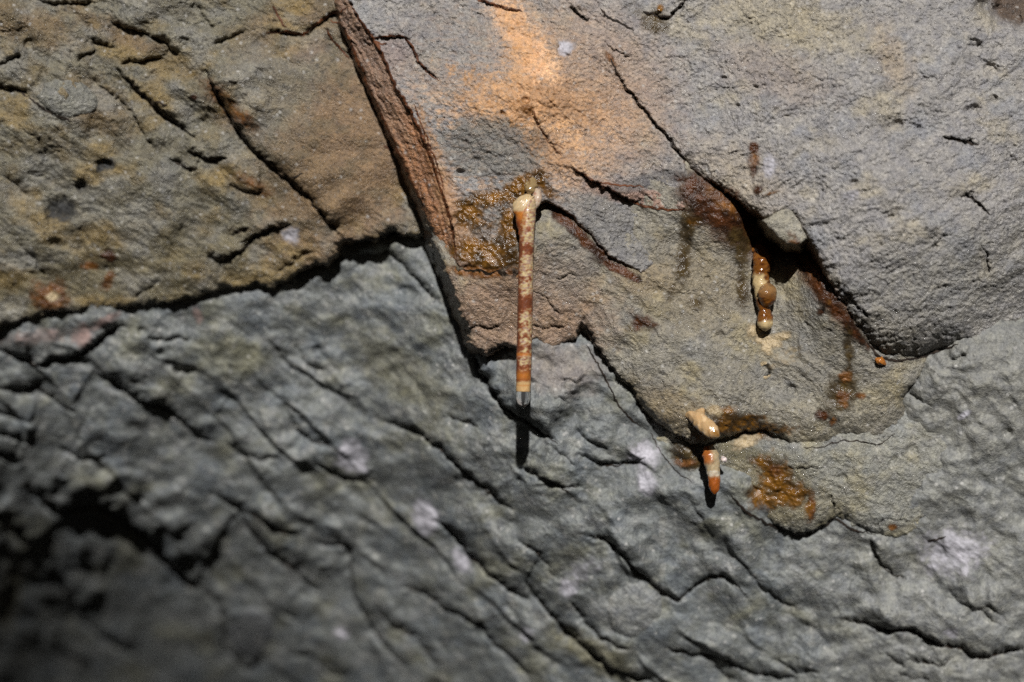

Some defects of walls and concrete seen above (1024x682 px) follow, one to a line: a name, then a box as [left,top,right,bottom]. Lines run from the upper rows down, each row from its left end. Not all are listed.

crack [610,58,685,162]
crack [533,110,689,211]
crack [208,226,283,259]
damp [670,213,702,293]
damp [729,227,750,307]
damp [747,325,791,379]
damp [707,405,786,449]